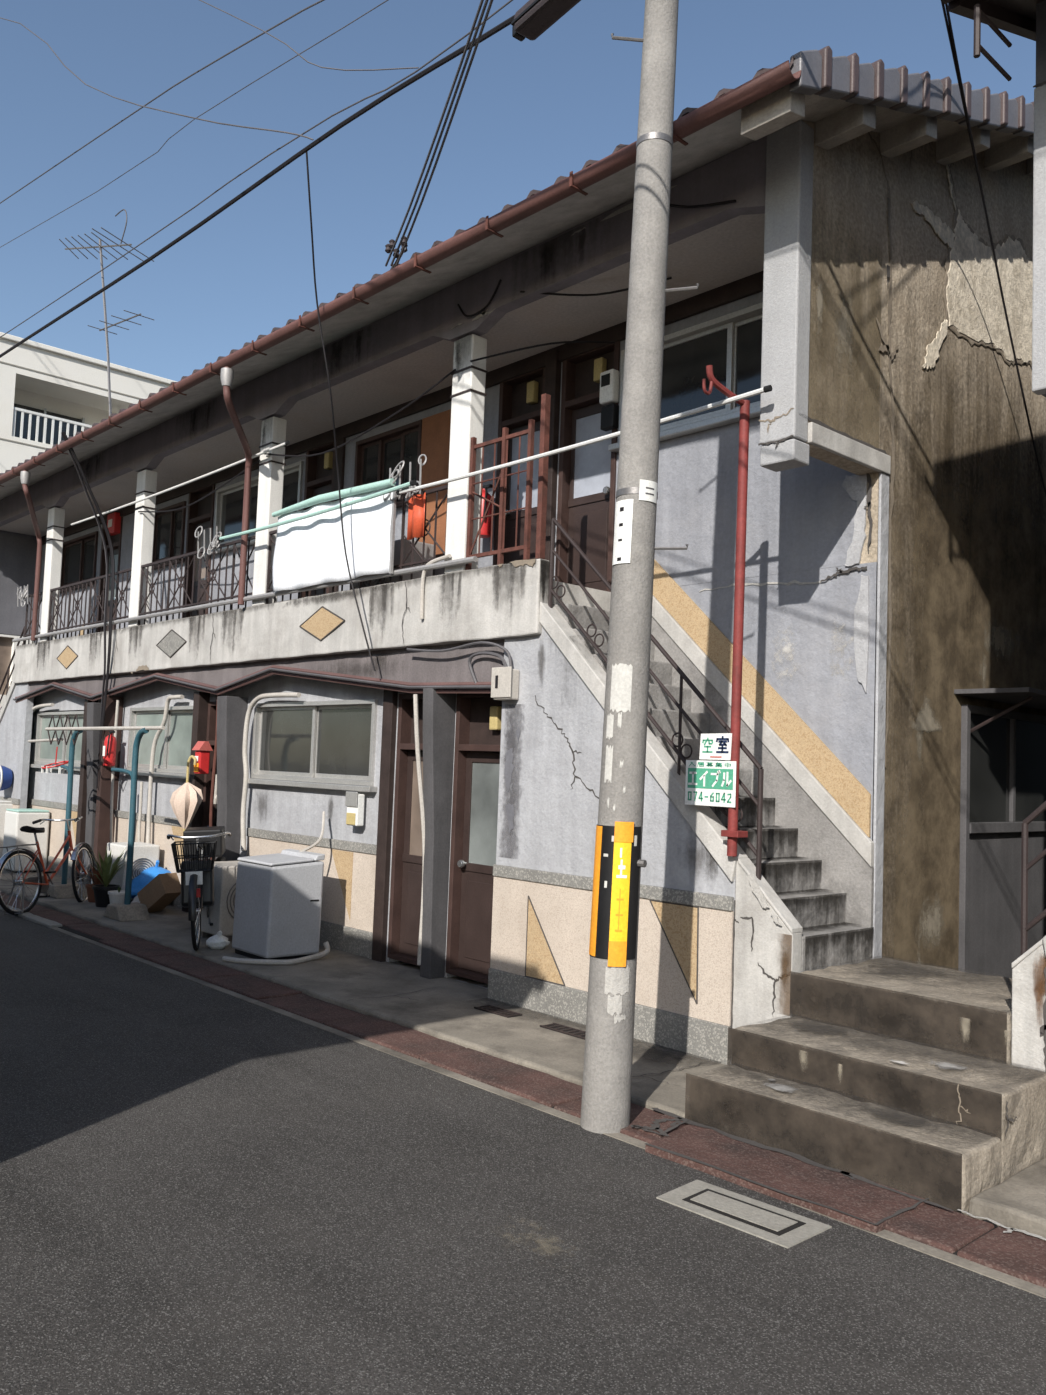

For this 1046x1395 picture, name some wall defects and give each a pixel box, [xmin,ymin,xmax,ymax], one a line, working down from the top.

spalling [911,165,1033,369]
crack [699,132,913,767]
damp [715,230,1046,1064]
crack [535,695,599,799]
crack [731,900,784,1028]
damp [685,1073,962,1213]
damp [727,1027,1002,1141]